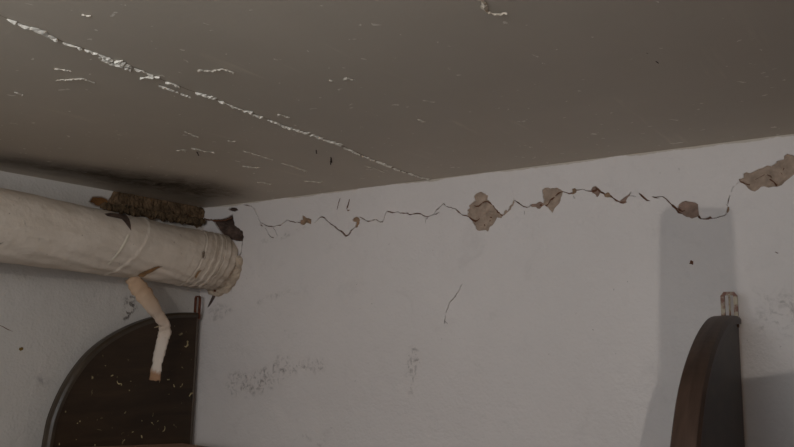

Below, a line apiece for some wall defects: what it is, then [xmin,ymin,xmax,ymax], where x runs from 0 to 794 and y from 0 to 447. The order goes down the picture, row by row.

peeling [480,0,507,16]
spalling [739,154,794,192]
damp [89,197,108,206]
crack [321,204,467,237]
spalling [467,192,515,231]
spalling [531,188,577,213]
crack [565,189,729,220]